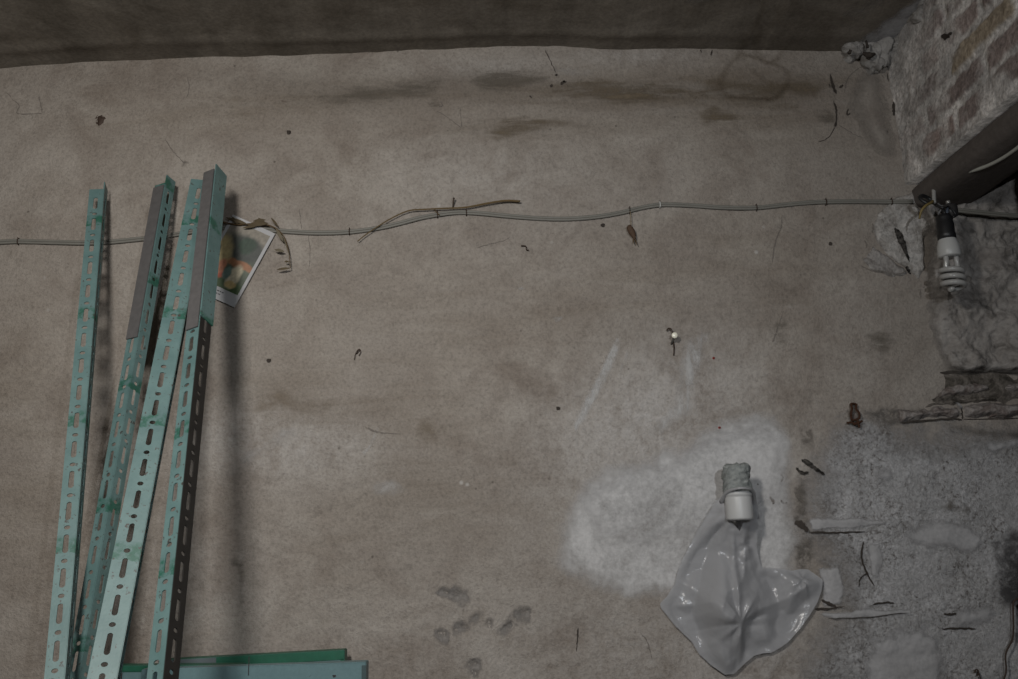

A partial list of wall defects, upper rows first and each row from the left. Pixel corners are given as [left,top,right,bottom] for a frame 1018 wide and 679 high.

flaking render [863,193,927,279]
spalling [794,371,1018,679]
leakage [1000,533,1018,607]